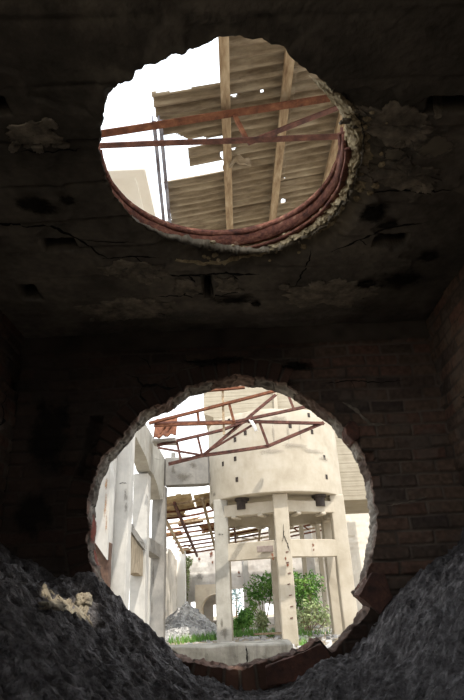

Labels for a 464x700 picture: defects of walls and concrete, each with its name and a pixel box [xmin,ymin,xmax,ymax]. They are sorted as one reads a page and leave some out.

peeling [5,117,70,154]
spalling [175,75,443,266]
crack [0,222,156,262]
peeling [278,278,381,309]